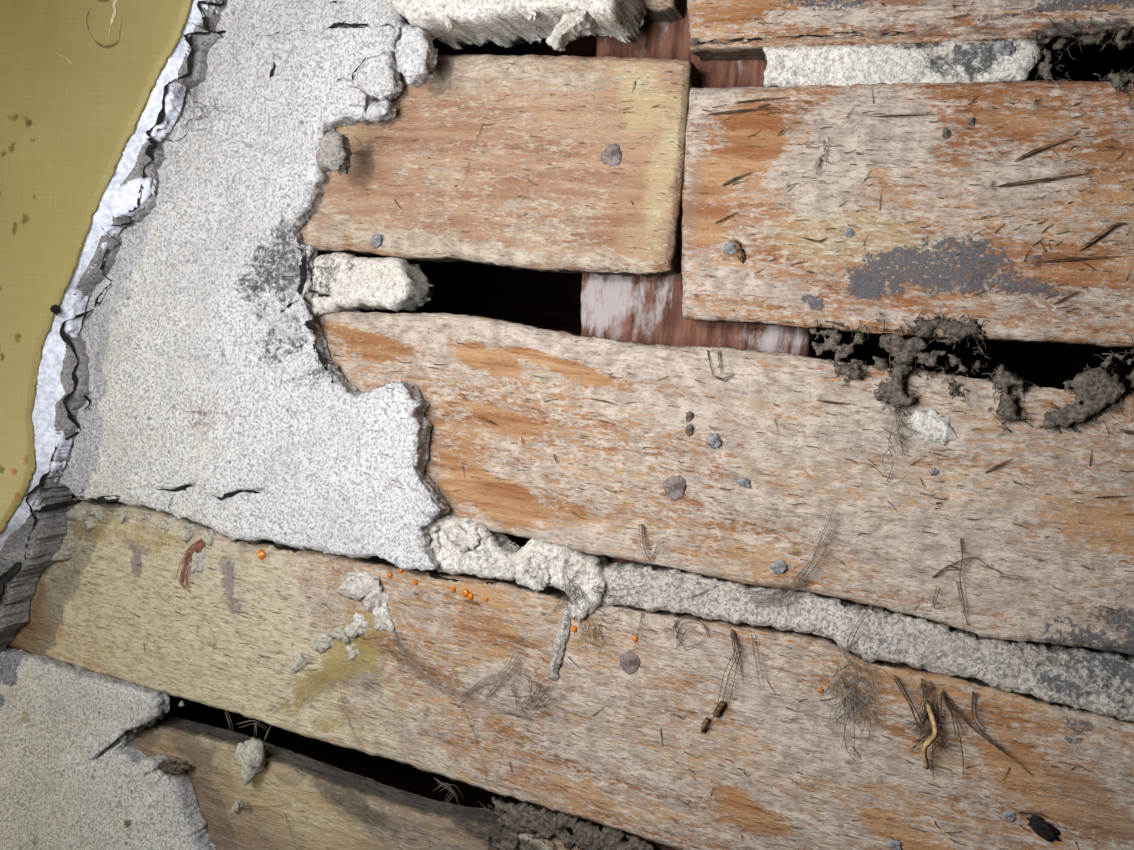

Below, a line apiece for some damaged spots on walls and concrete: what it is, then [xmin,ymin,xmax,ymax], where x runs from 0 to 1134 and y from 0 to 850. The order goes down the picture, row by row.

flaking render [356,23,438,124]
crack [0,0,226,596]
flaking render [0,0,228,652]
flaking render [275,243,316,339]
flaking render [274,351,319,381]
flaking render [908,409,958,446]
crack [158,484,260,509]
flaking render [408,463,446,520]
flaking render [548,607,572,682]
crack [96,723,150,760]
peeling [1026,815,1061,842]